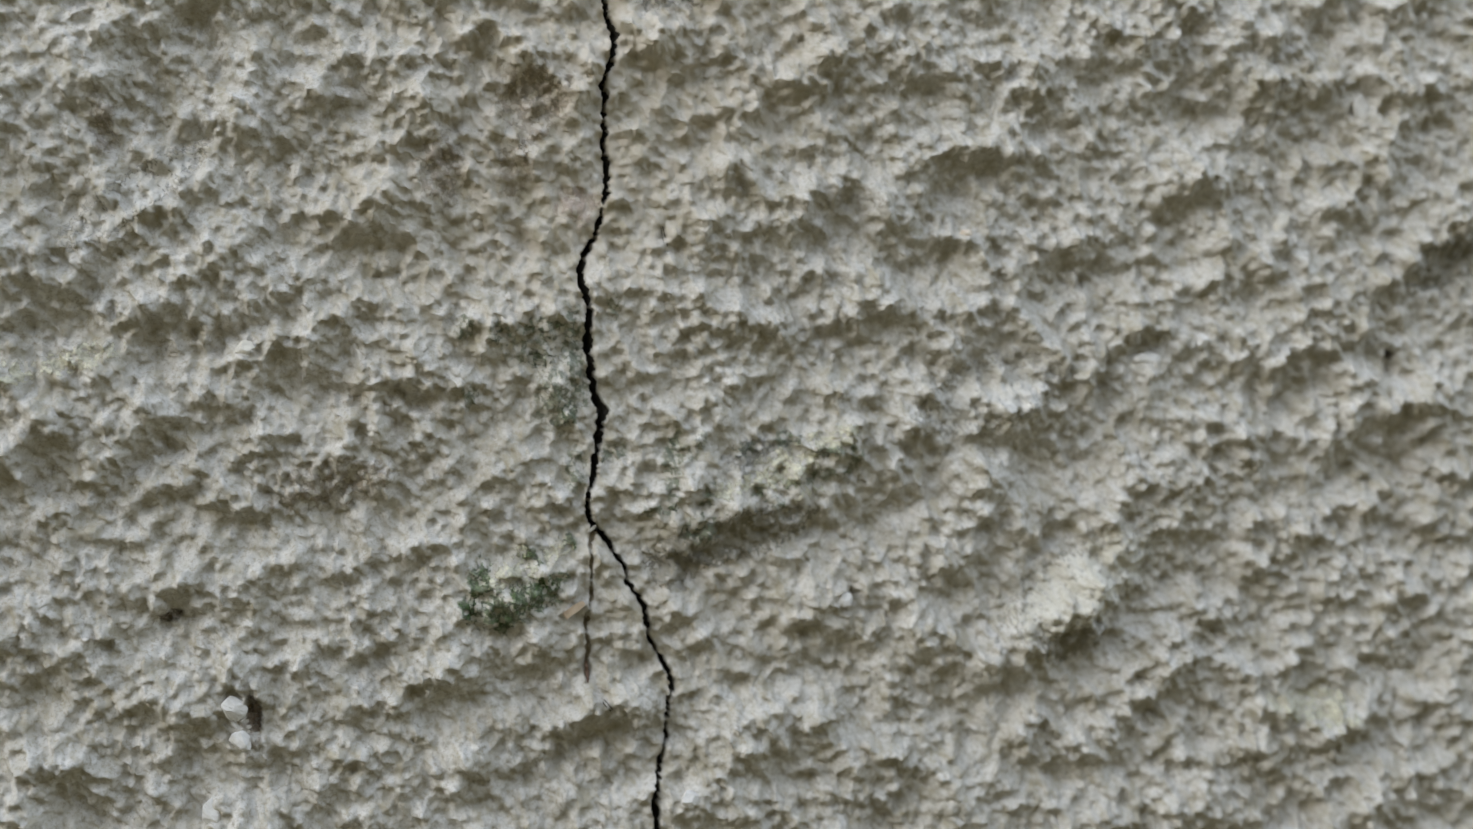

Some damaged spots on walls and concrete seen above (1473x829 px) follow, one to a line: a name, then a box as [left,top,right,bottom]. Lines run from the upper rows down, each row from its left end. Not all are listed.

crack [576,0,674,829]